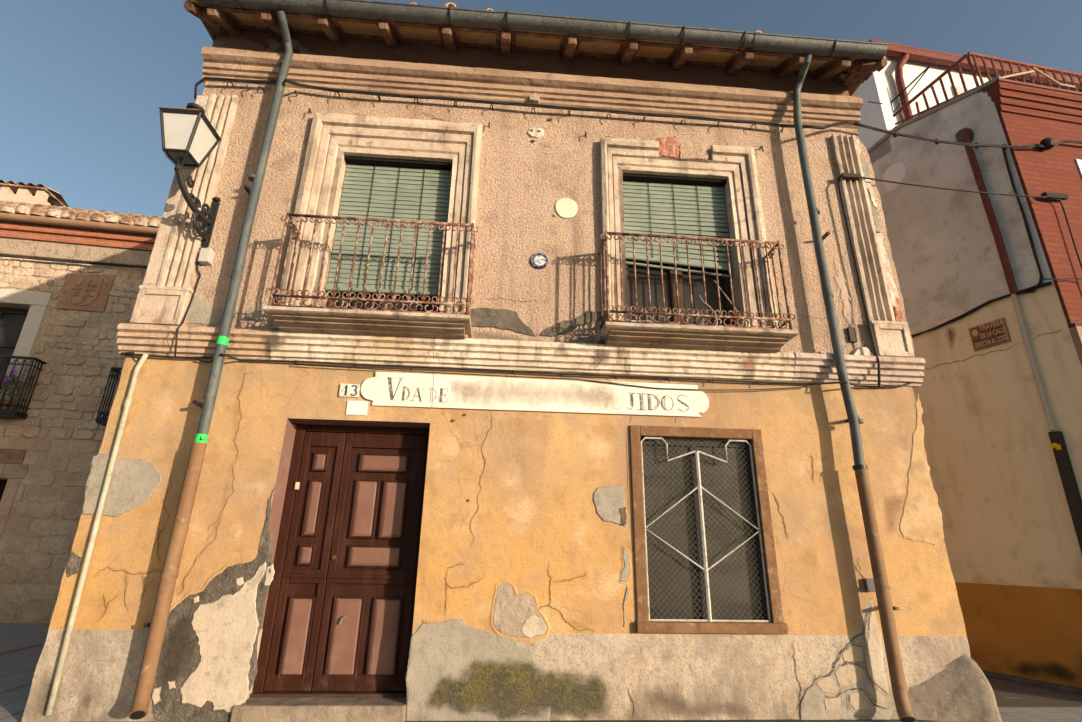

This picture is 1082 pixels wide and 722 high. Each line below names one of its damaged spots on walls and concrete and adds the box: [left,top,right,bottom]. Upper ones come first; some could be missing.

spalling [655,136,708,160]
crack [93,375,245,621]
crack [421,411,493,624]
spalling [619,507,627,525]
spalling [899,394,944,546]
peeling [152,481,277,722]
spalling [489,579,551,643]
crack [793,643,802,713]